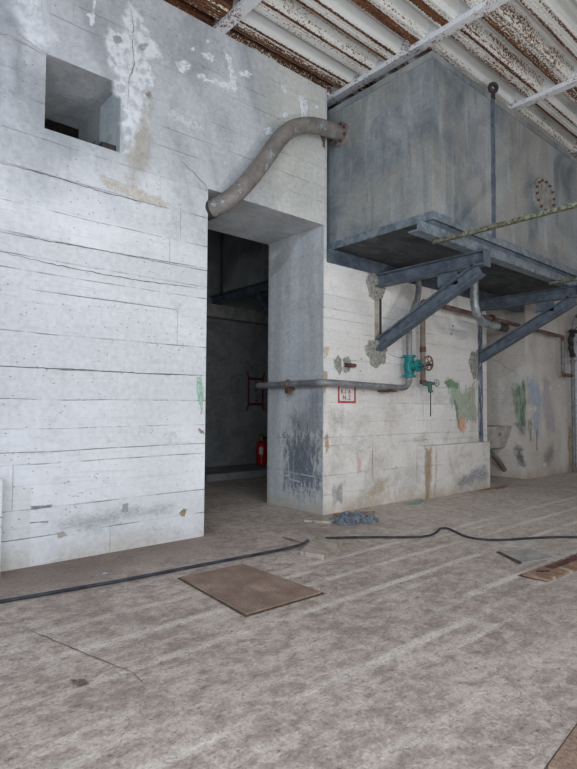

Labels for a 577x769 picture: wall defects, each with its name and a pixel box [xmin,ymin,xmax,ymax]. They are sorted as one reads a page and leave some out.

leakage [105,1,163,155]
crack [32,631,143,683]